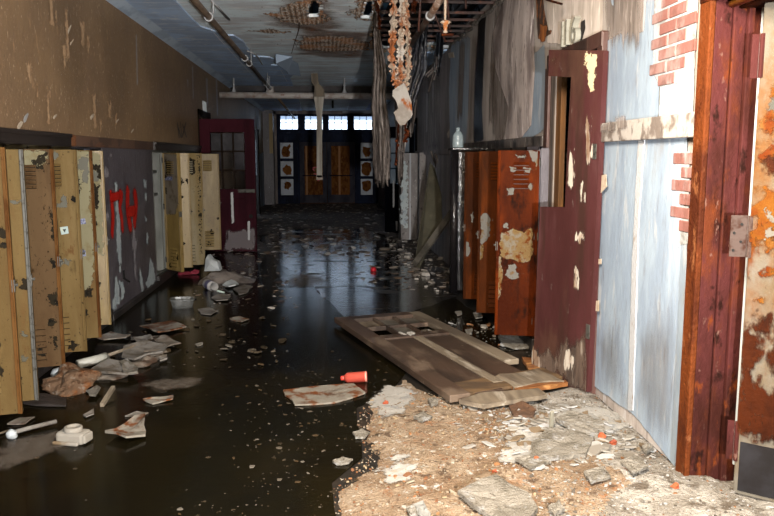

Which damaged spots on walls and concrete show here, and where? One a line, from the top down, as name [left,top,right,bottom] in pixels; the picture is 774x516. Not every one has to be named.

water stain [489,4,508,140]
peeling [584,51,597,92]
flaking render [649,0,699,86]
rust [756,110,774,134]
rust [754,144,774,174]
rust [749,185,774,254]
rust [758,266,774,277]
rust [737,312,774,444]